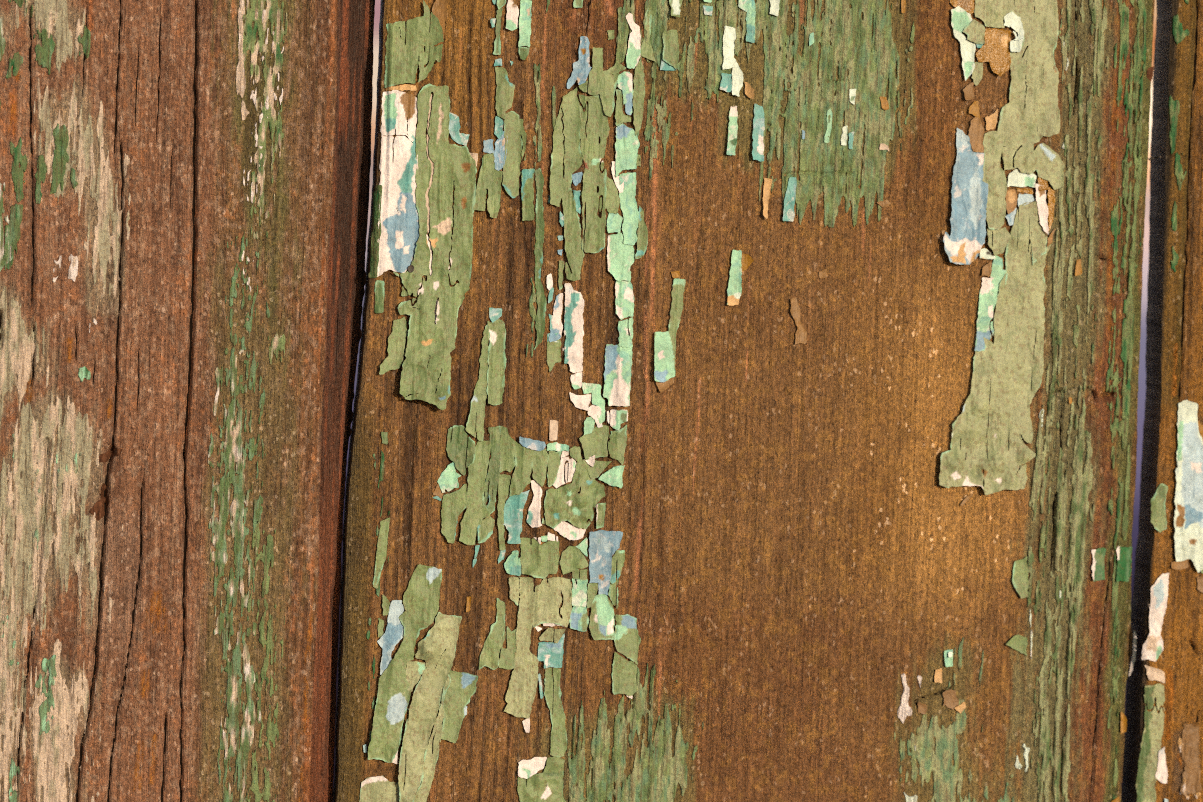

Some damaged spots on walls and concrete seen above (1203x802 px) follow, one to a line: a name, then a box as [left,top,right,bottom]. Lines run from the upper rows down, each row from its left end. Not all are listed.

peeling [0,286,114,802]
peeling [0,0,131,297]
crack [75,0,197,802]
peeling [359,0,915,802]
peeling [894,0,1203,802]